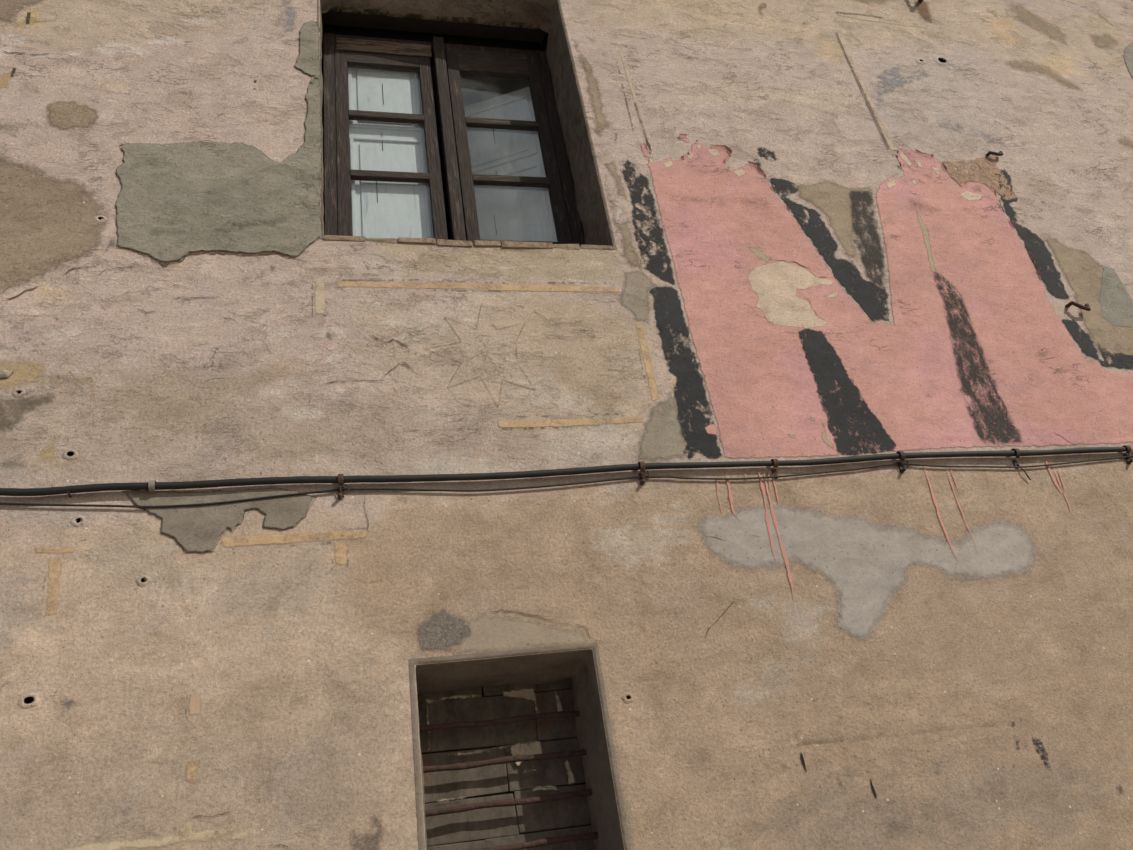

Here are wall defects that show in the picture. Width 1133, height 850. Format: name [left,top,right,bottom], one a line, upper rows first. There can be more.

rust [917,2,931,21]
flaking render [47,101,97,130]
flaking render [0,158,107,291]
peeling [748,247,839,328]
crack [484,609,605,643]